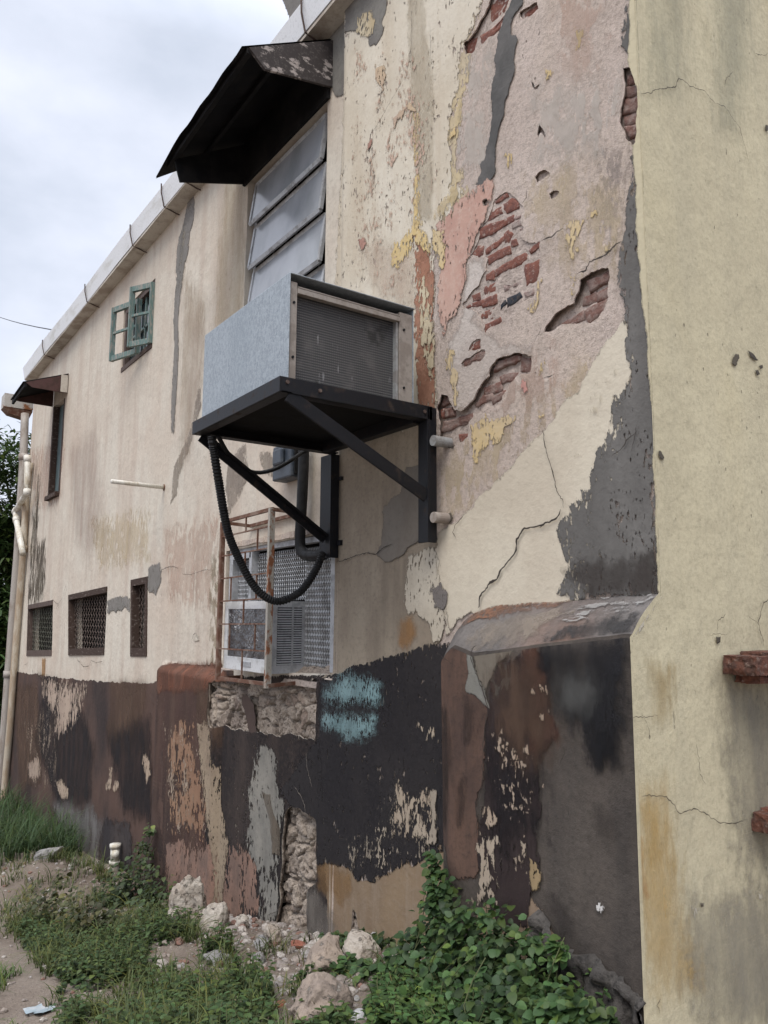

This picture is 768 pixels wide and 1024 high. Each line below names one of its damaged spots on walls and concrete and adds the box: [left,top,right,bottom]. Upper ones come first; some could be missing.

spalling [621,68,638,145]
crack [641,76,747,154]
spalling [351,10,542,448]
spalling [545,268,610,332]
crack [478,433,564,608]
peeling [405,547,452,643]
rust [156,662,226,694]
spalling [163,667,330,844]
spalling [279,807,317,927]
peeling [346,779,437,873]
peeling [468,728,544,906]
crack [645,794,741,824]